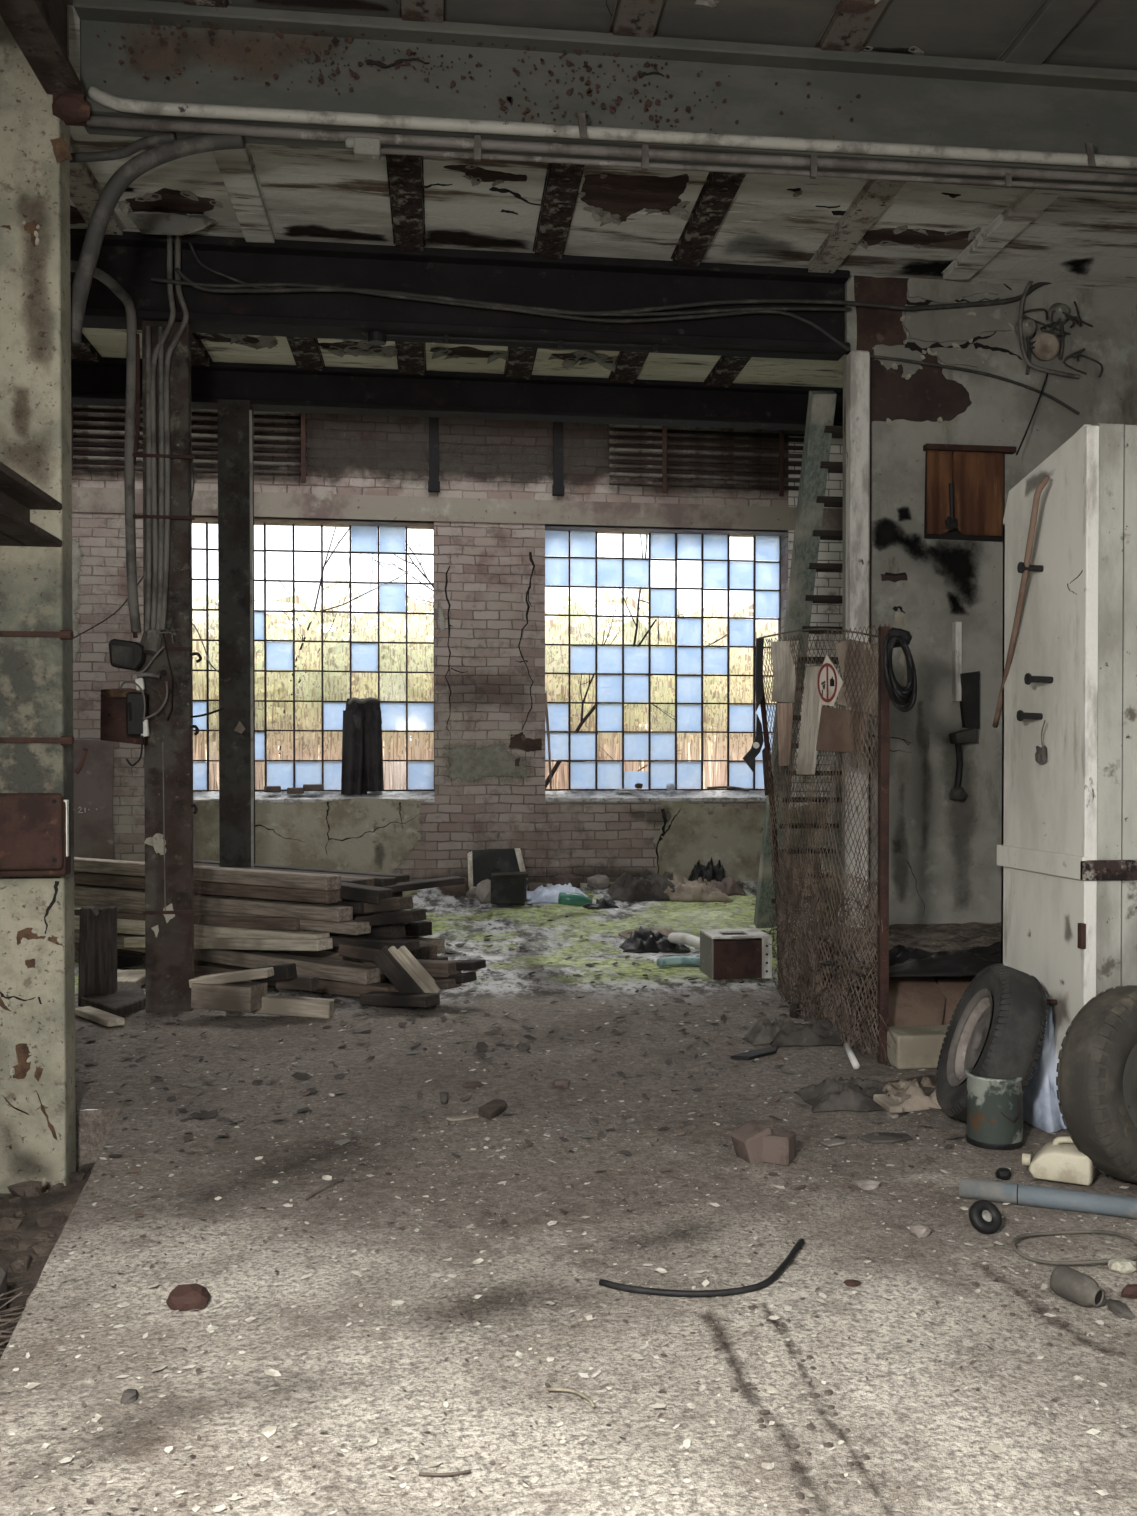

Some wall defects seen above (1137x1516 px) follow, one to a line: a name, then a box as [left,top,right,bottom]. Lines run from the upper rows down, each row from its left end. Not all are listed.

rust [96,17,730,130]
peeling [577,174,690,226]
peeling [858,225,981,249]
peeling [854,275,1015,425]
crack [516,552,535,770]
crack [255,802,419,853]
crack [656,808,681,874]